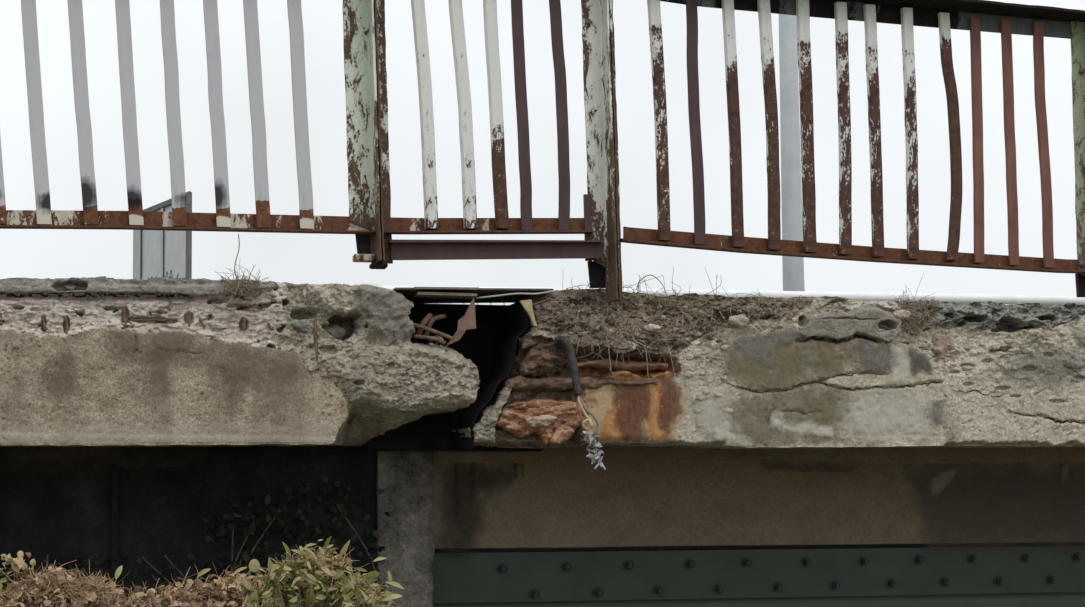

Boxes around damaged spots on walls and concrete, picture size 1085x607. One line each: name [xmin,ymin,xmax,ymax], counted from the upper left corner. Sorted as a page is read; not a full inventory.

spalling [0,282,1085,448]
corrosion [496,340,685,445]
crack [724,372,1085,430]